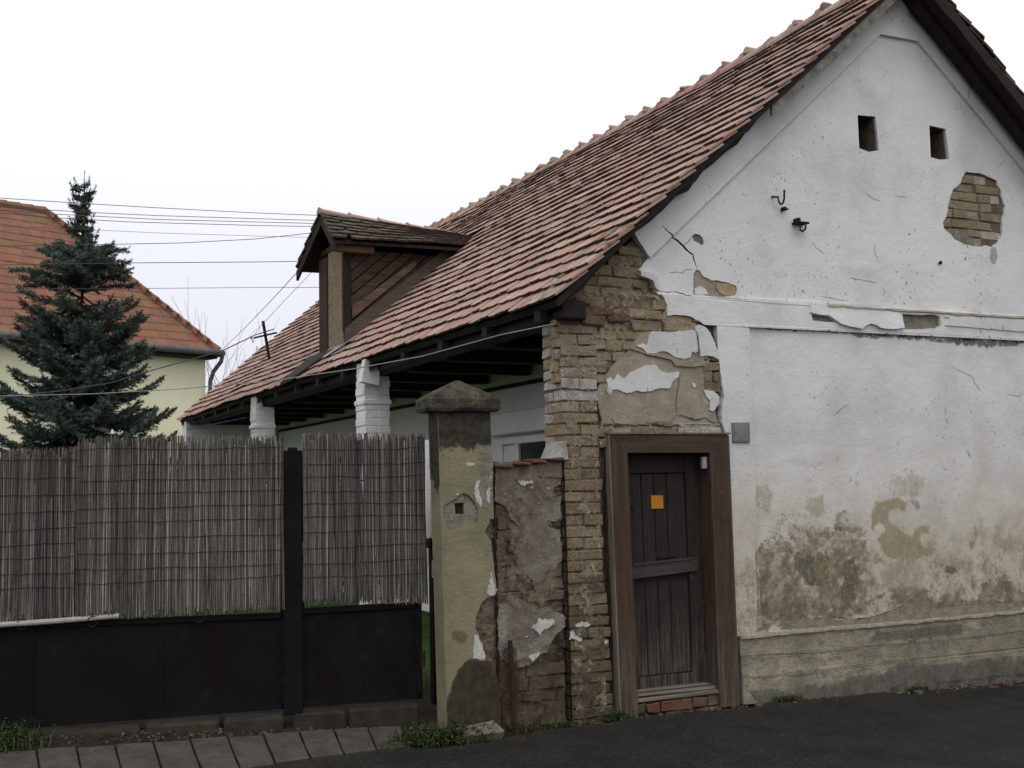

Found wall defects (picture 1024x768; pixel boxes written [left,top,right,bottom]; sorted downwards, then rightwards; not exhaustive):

spalling [943,175,1000,247]
crack [661,226,697,296]
spalling [693,270,736,297]
peeling [810,303,1024,332]
spalling [443,242,722,729]
damp [755,497,1024,632]
damp [750,656,1024,705]